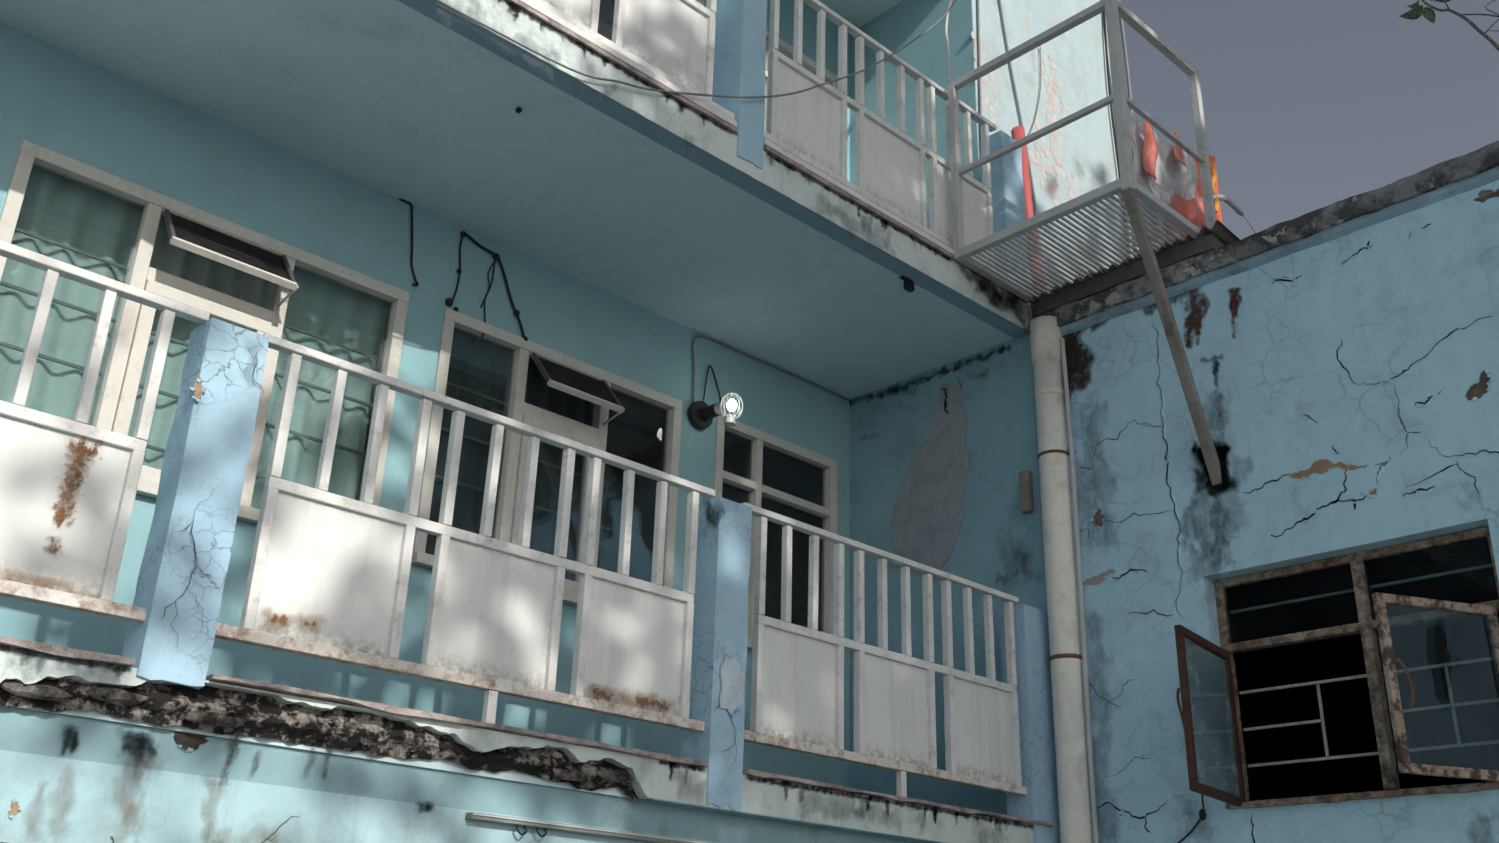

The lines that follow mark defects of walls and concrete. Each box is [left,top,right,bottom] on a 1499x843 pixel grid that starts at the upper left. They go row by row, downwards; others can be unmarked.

leakage [768,153,1024,323]
rust [1184,290,1210,348]
rust [1229,288,1242,338]
rust [45,438,103,552]
crack [1068,323,1186,619]
leakage [1192,442,1237,497]
peeling [1287,459,1367,479]
crack [1271,316,1499,537]
flaking render [1466,370,1493,402]
crack [161,490,214,648]
spalling [0,676,639,802]
leakage [747,775,1033,830]